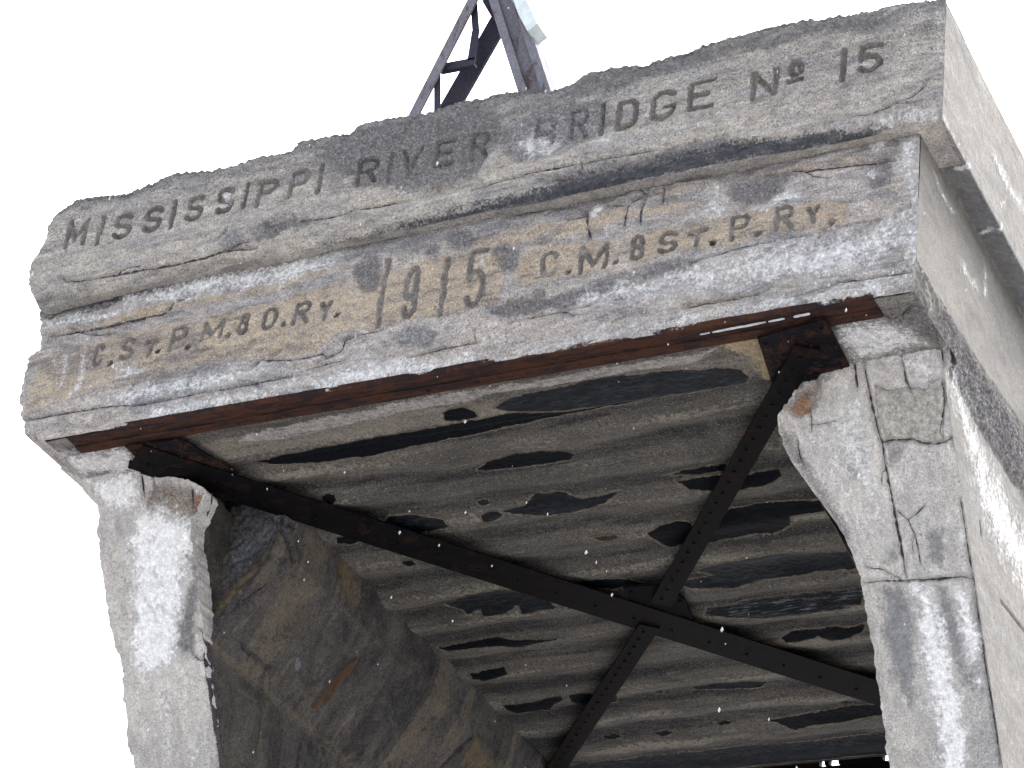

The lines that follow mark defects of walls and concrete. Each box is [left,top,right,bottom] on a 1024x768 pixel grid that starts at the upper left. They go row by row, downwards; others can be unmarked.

crack [773,161,890,178]
crack [64,233,257,282]
corrosion [720,339,770,380]
crack [854,364,1023,755]